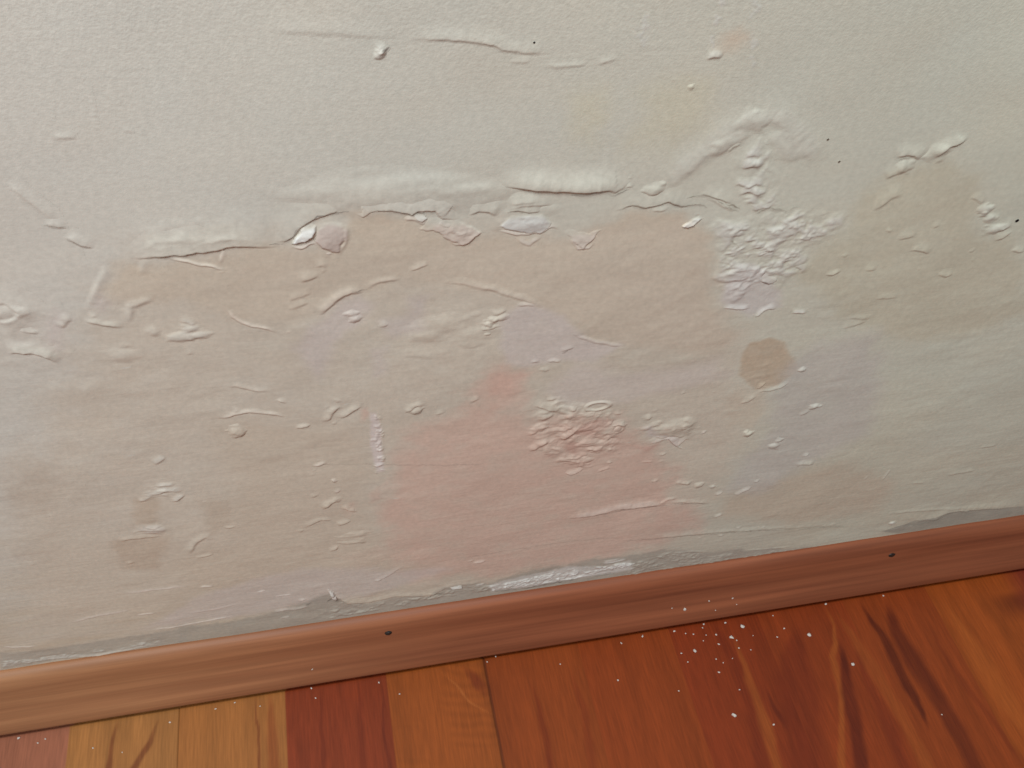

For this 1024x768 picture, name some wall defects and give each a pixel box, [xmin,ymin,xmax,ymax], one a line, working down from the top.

peeling [110,191,603,260]
water stain [0,147,1024,644]